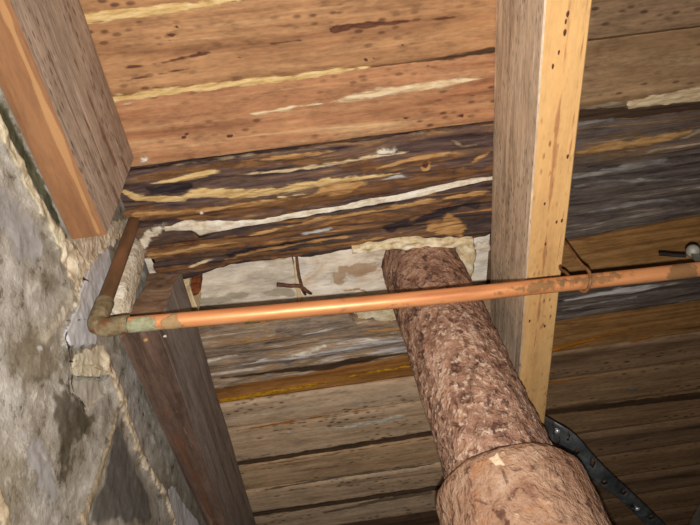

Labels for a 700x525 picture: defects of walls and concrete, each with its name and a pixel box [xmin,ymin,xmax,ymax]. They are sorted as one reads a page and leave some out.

water stain [28,391,94,499]